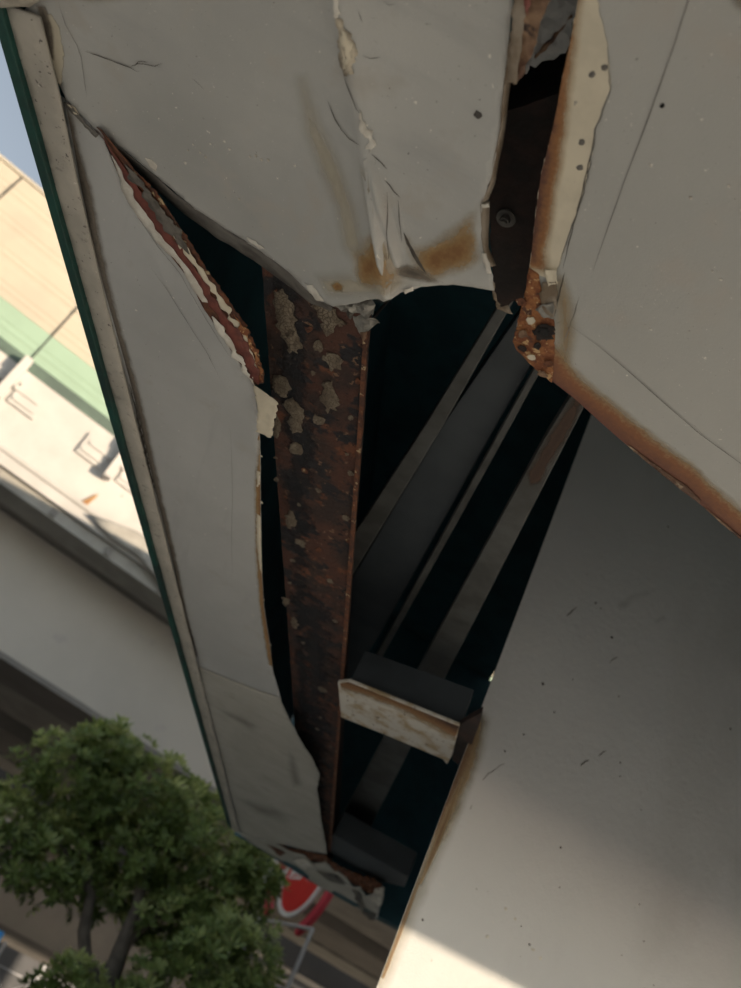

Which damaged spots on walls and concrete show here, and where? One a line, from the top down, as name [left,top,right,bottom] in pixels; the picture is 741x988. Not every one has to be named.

peeling [38,6,64,85]
crack [58,3,160,89]
peeling [333,0,358,76]
corrosion [357,242,395,290]
corrosion [417,223,475,276]
peeling [482,253,492,274]
peeling [530,0,611,319]
corrosion [513,0,741,536]
crack [594,1,688,267]
crack [554,126,740,463]
corrosion [255,436,272,666]
corrosion [273,277,459,831]